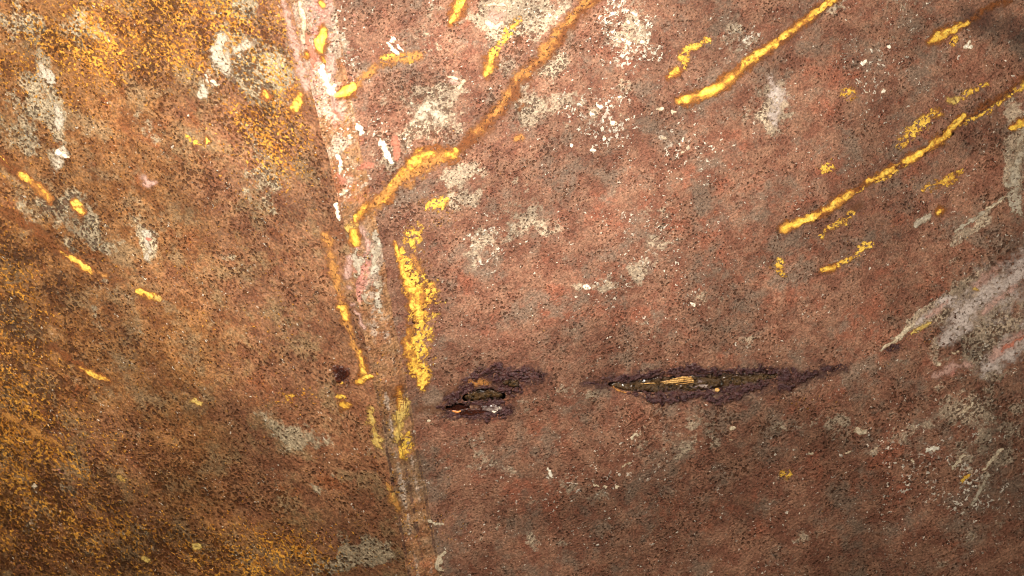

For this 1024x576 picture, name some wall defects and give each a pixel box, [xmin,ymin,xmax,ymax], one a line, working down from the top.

rust [303,23,331,65]
rust [665,36,711,81]
rust [675,0,842,108]
rust [926,0,1014,47]
rust [333,0,599,248]
rust [776,75,1024,239]
rust [0,207,107,278]
rust [819,241,874,274]
rust [322,232,374,386]
rust [365,224,446,460]
rust [436,362,547,423]
rust [584,362,842,407]